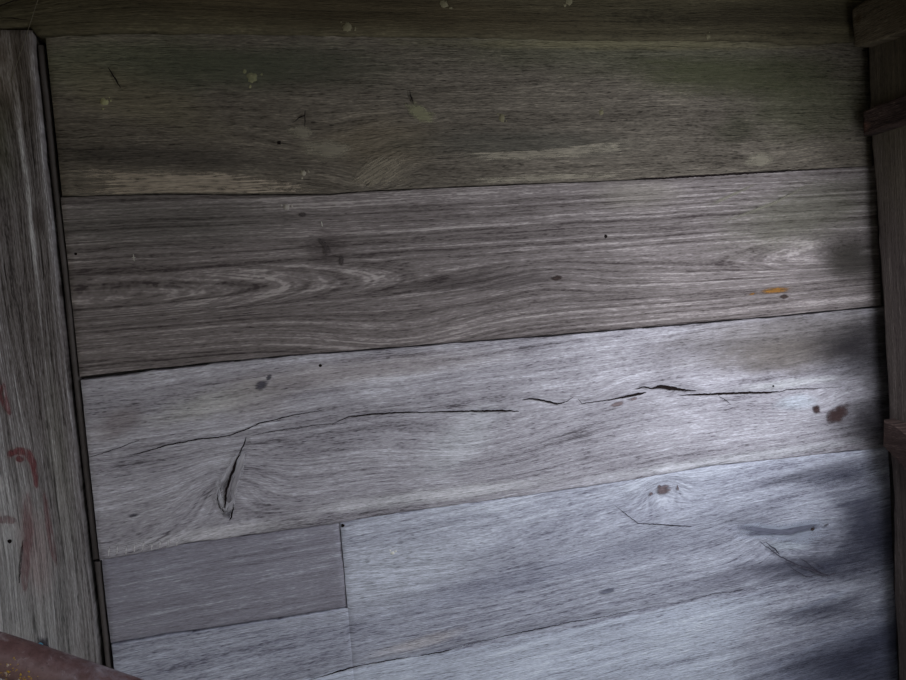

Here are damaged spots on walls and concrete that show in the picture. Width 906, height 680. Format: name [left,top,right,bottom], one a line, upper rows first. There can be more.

crack [91,385,836,520]